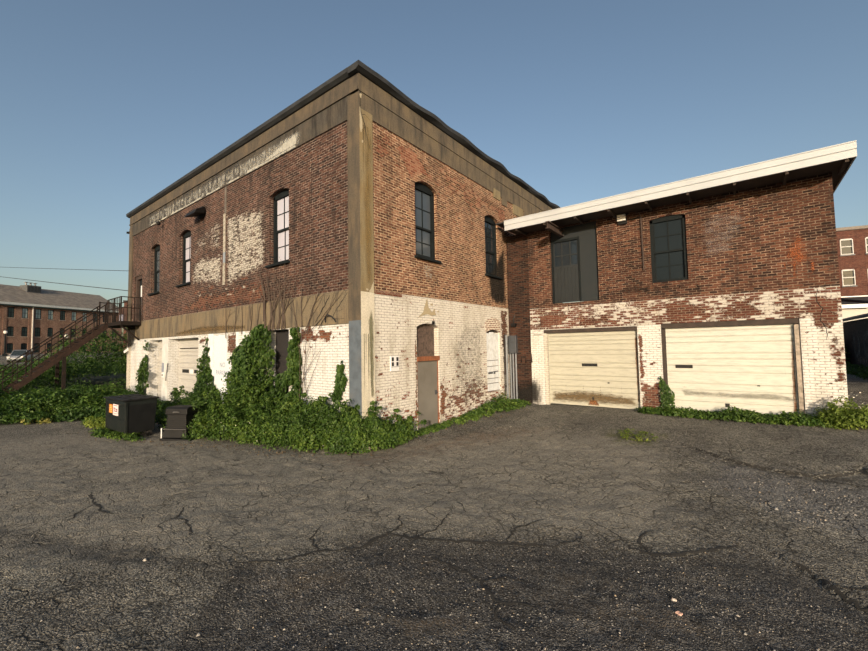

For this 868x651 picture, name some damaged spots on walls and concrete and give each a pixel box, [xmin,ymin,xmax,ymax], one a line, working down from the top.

peeling [184,209,265,311]
peeling [299,326,349,354]
peeling [419,294,439,317]
peeling [440,347,488,417]
peeling [500,311,509,373]
peeling [538,310,618,328]
peeling [638,335,663,408]
peeling [650,297,762,331]
peeling [805,296,846,389]